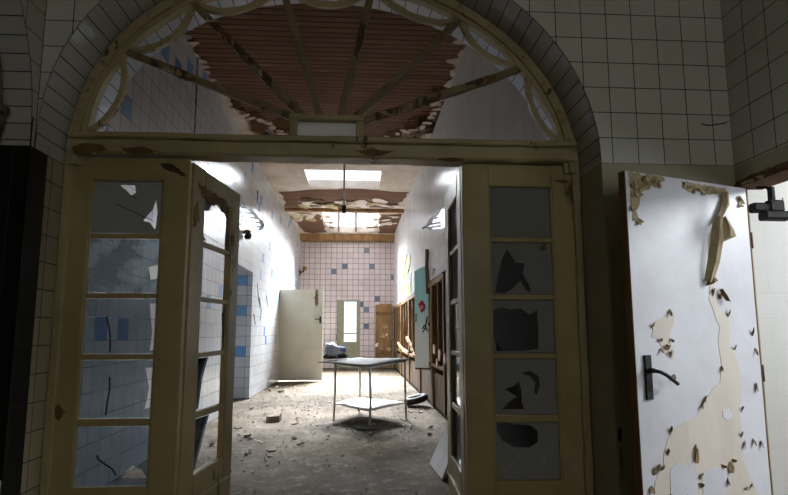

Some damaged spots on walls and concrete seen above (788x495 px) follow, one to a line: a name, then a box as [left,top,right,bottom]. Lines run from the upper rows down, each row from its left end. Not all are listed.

spalling [183,4,466,137]
spalling [279,188,409,234]
peeling [650,258,764,495]